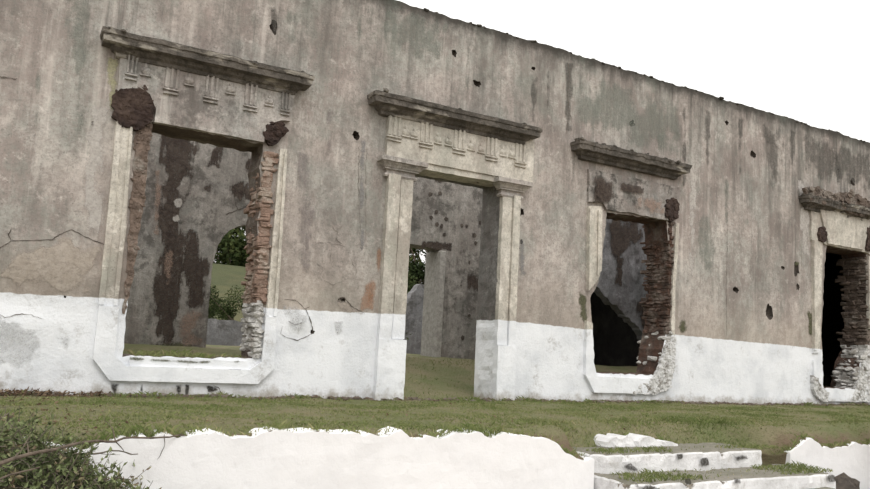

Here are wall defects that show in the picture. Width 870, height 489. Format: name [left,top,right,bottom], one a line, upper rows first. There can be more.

spalling [111,85,160,314]
water stain [208,147,223,168]
water stain [230,158,251,201]
water stain [594,177,644,203]
crack [0,229,104,248]
water stain [153,135,210,346]
spalling [239,121,289,359]
water stain [609,220,643,286]
crack [281,299,313,341]
spalling [633,197,680,396]
spalling [802,178,870,403]